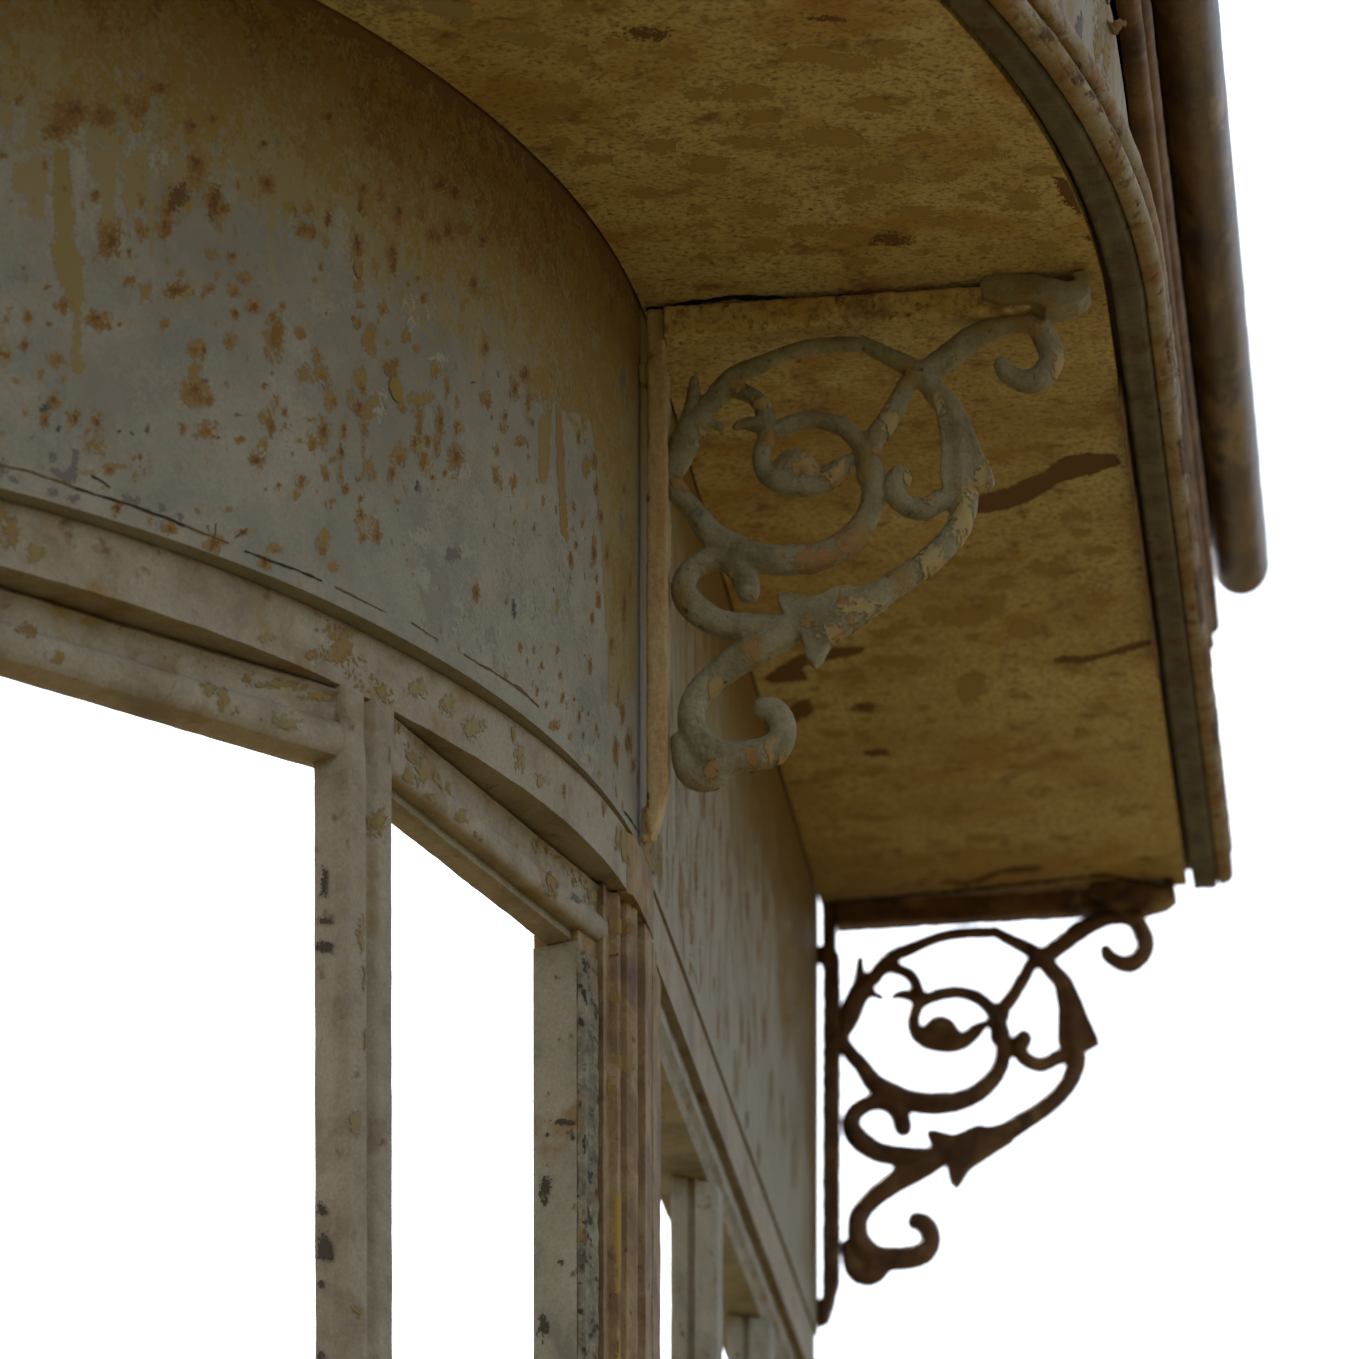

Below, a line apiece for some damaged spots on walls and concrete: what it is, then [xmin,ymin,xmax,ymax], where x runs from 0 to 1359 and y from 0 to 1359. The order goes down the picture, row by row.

water stain [0,0,640,706]
rust [909,452,1122,581]
rust [765,591,887,738]